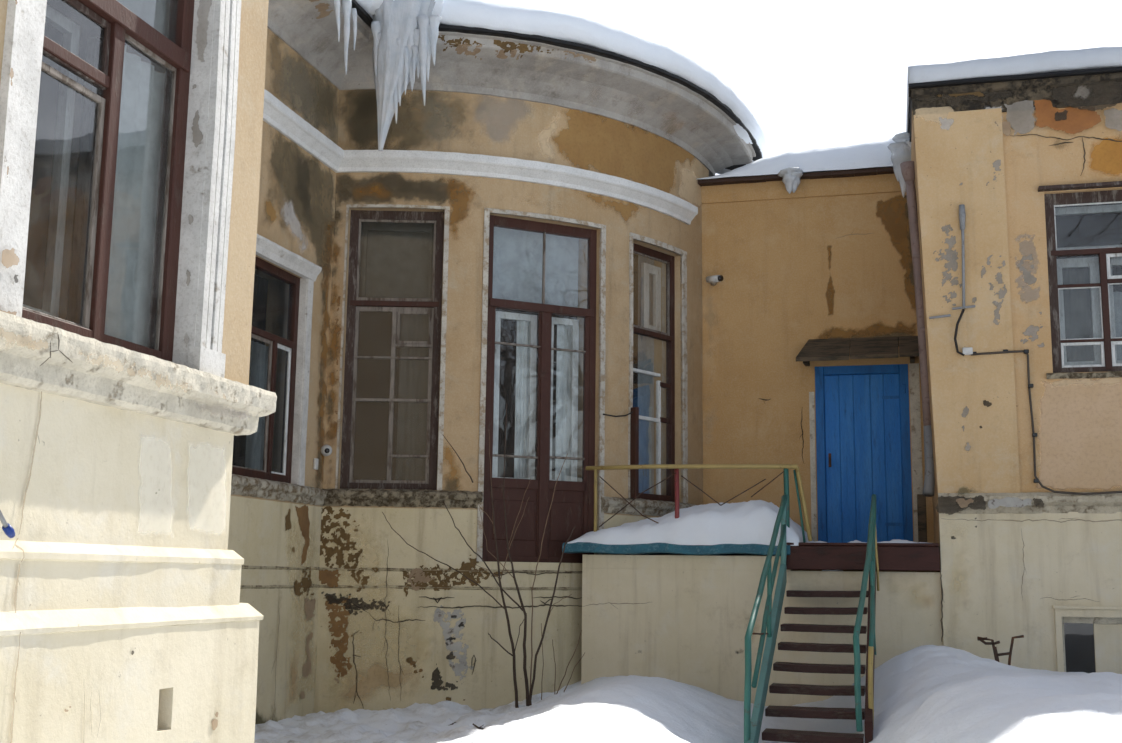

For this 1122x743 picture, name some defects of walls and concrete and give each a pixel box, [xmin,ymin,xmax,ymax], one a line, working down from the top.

damp [266,132,474,272]
damp [539,109,701,206]
spalling [986,81,1122,136]
crack [1010,134,1122,174]
damp [1090,138,1122,174]
damp [818,246,915,346]
damp [876,196,916,309]
crack [10,335,73,743]
peeling [285,505,390,699]
peeling [402,555,502,596]
spalling [936,488,1044,528]
peeling [406,605,473,701]